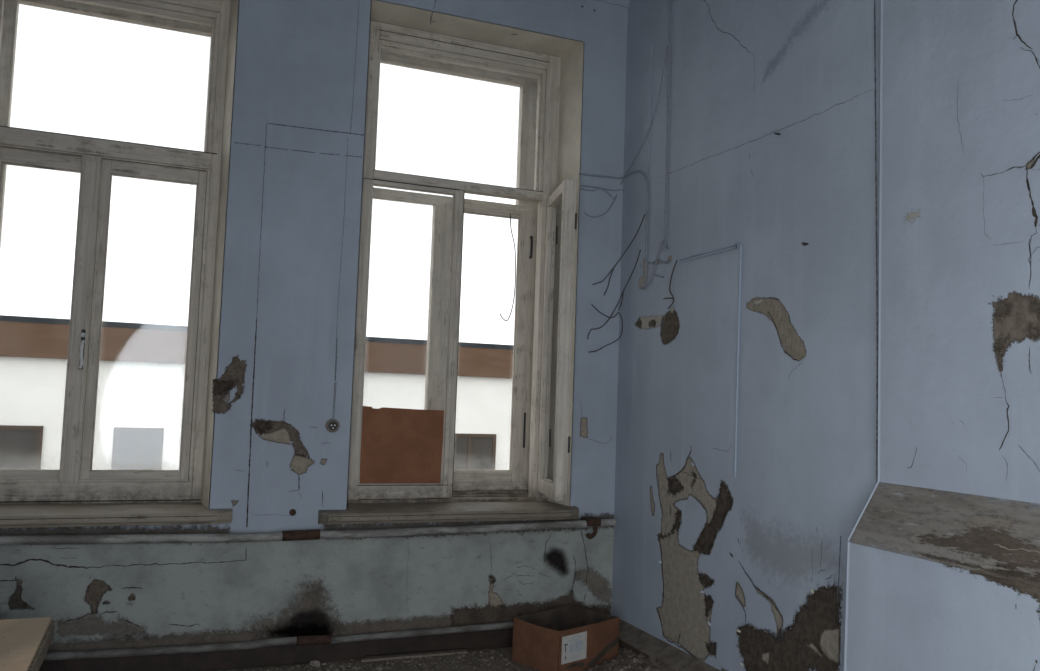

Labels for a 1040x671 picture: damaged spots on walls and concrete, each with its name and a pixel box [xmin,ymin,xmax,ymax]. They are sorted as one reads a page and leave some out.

crack [1012,0,1040,68]
crack [981,152,1040,287]
flaking render [635,308,680,345]
flaking render [746,297,806,362]
flaking render [988,290,1040,377]
flaking render [211,355,247,414]
flaking render [250,409,327,491]
crack [994,372,1040,479]
flaking render [57,576,146,638]
peeling [650,450,733,671]
flaking render [730,540,843,671]
flaking render [916,551,1040,621]